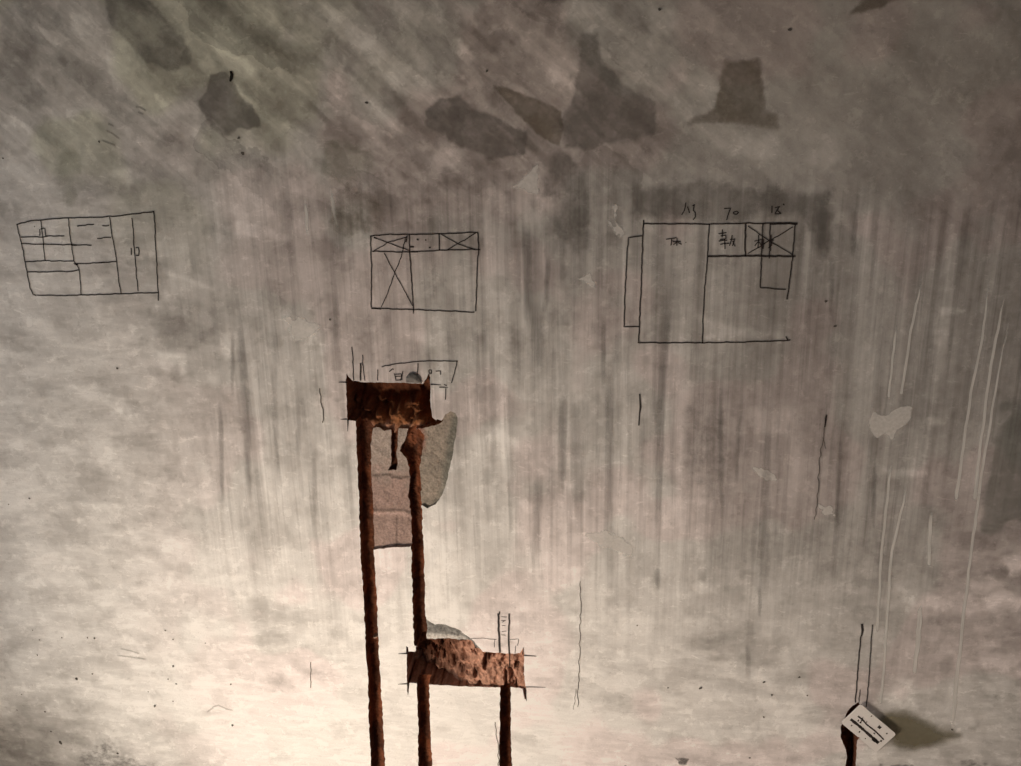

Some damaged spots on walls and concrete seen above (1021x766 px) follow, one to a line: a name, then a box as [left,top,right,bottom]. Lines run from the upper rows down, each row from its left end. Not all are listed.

spalling [346,374,457,550]
damp [876,290,1002,748]
spalling [407,619,526,699]